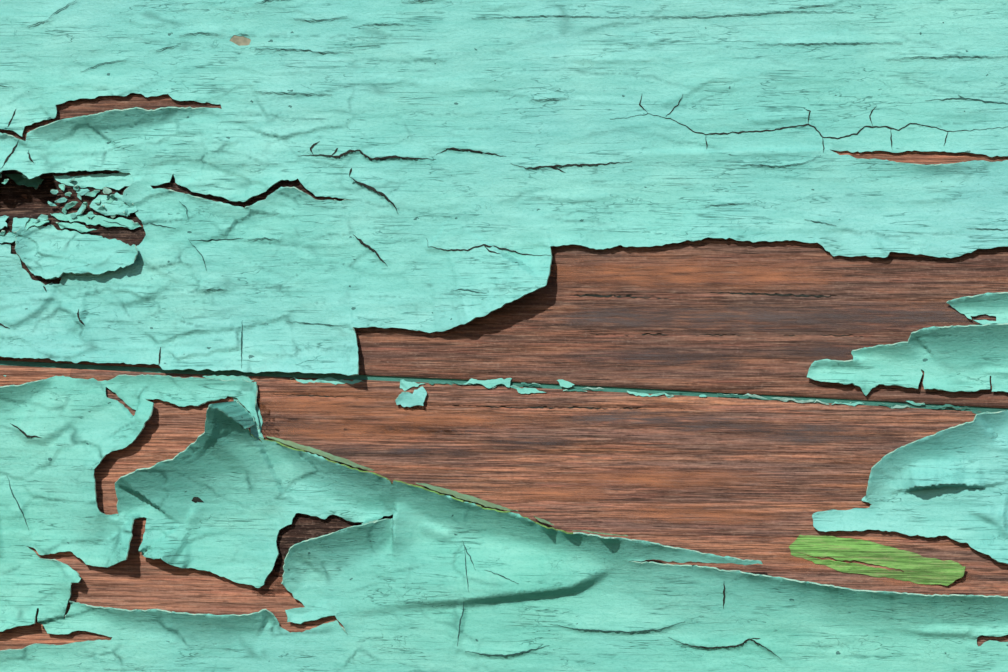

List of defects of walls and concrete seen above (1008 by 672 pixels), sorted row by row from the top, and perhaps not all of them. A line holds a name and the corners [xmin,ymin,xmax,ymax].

peeling [0,78,238,157]
crack [301,142,632,213]
crack [615,95,1008,167]
peeling [821,140,1008,180]
peeling [0,159,363,279]
peeling [0,221,1008,664]